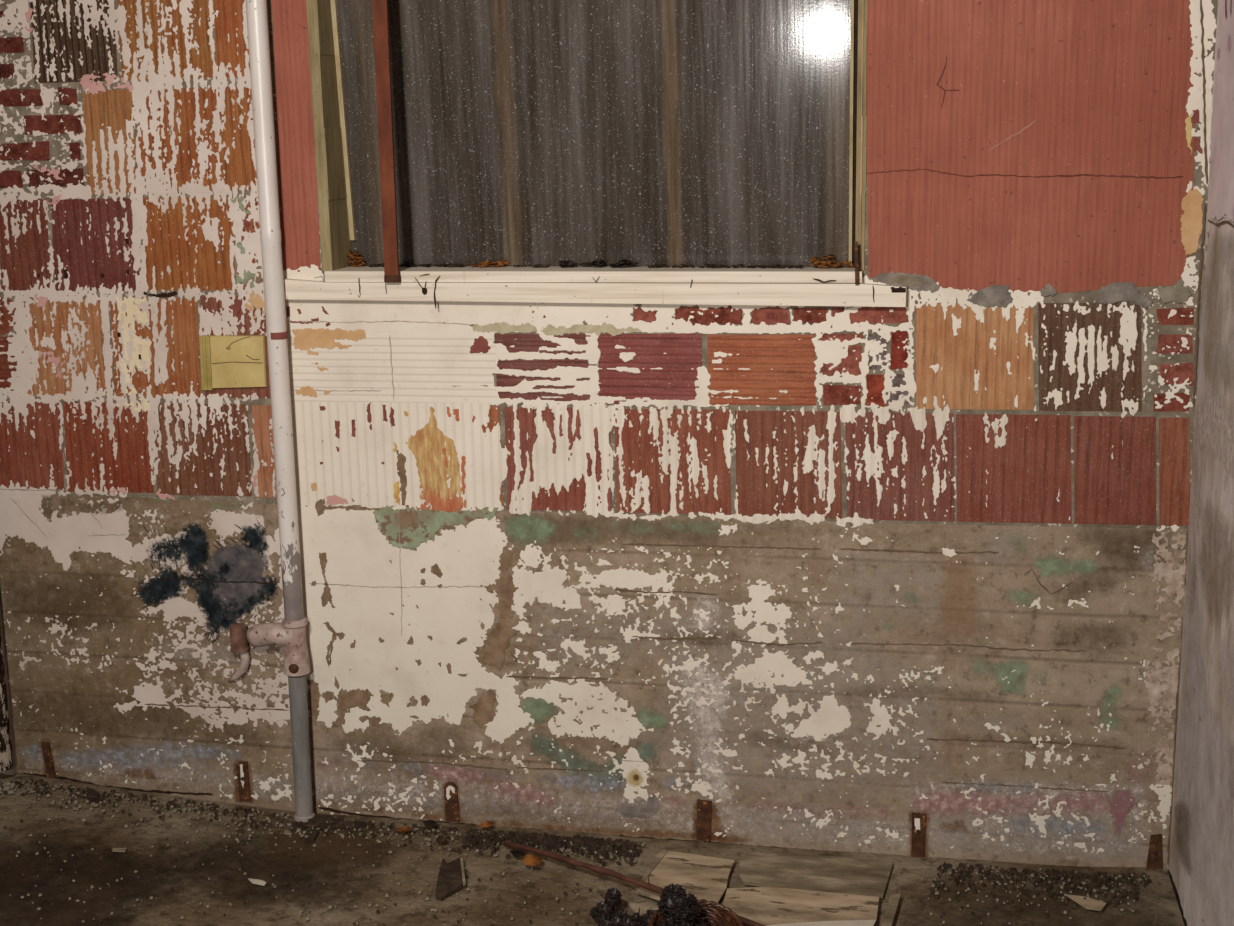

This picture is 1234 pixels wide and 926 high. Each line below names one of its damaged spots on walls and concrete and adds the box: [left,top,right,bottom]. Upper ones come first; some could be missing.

peeling [0,0,293,801]
water stain [212,521,266,555]
peeling [283,0,1234,854]
crack [867,0,1234,407]
crack [1182,530,1190,583]
crack [1167,614,1186,926]